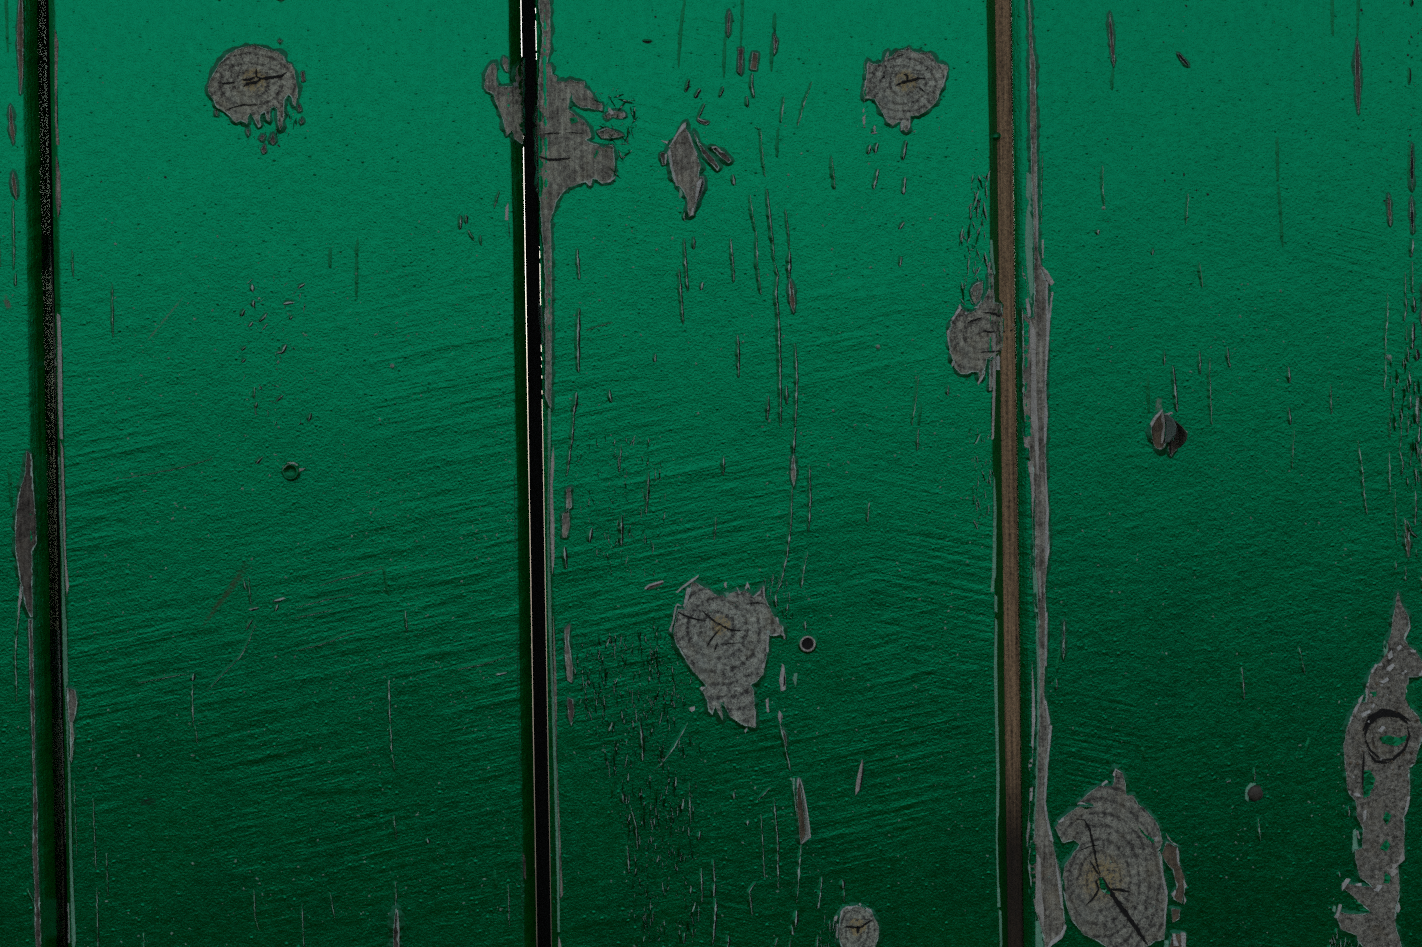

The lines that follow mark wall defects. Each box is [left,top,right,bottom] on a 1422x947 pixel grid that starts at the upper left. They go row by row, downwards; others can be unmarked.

peeling [204,38,306,155]
peeling [860,45,950,136]
peeling [481,0,799,947]
peeling [945,0,1191,947]
peeling [820,902,882,947]
peeling [1328,589,1422,947]